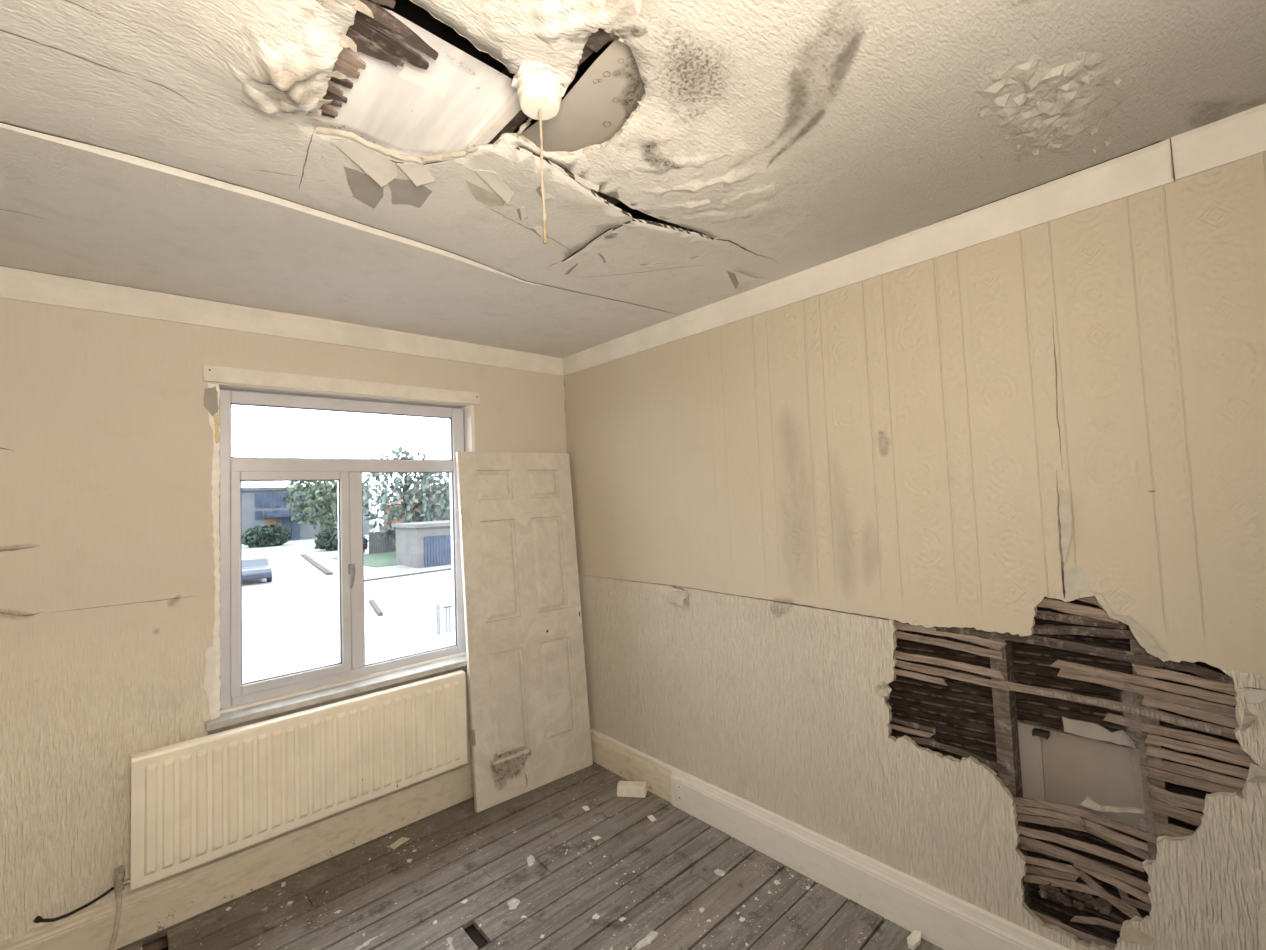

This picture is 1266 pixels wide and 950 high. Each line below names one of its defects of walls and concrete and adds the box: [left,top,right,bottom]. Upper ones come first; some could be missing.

water stain [669,45,722,115]
water stain [786,81,822,138]
water stain [835,39,858,80]
flaking render [972,51,1126,161]
crack [0,122,778,312]
spalling [876,590,1266,950]